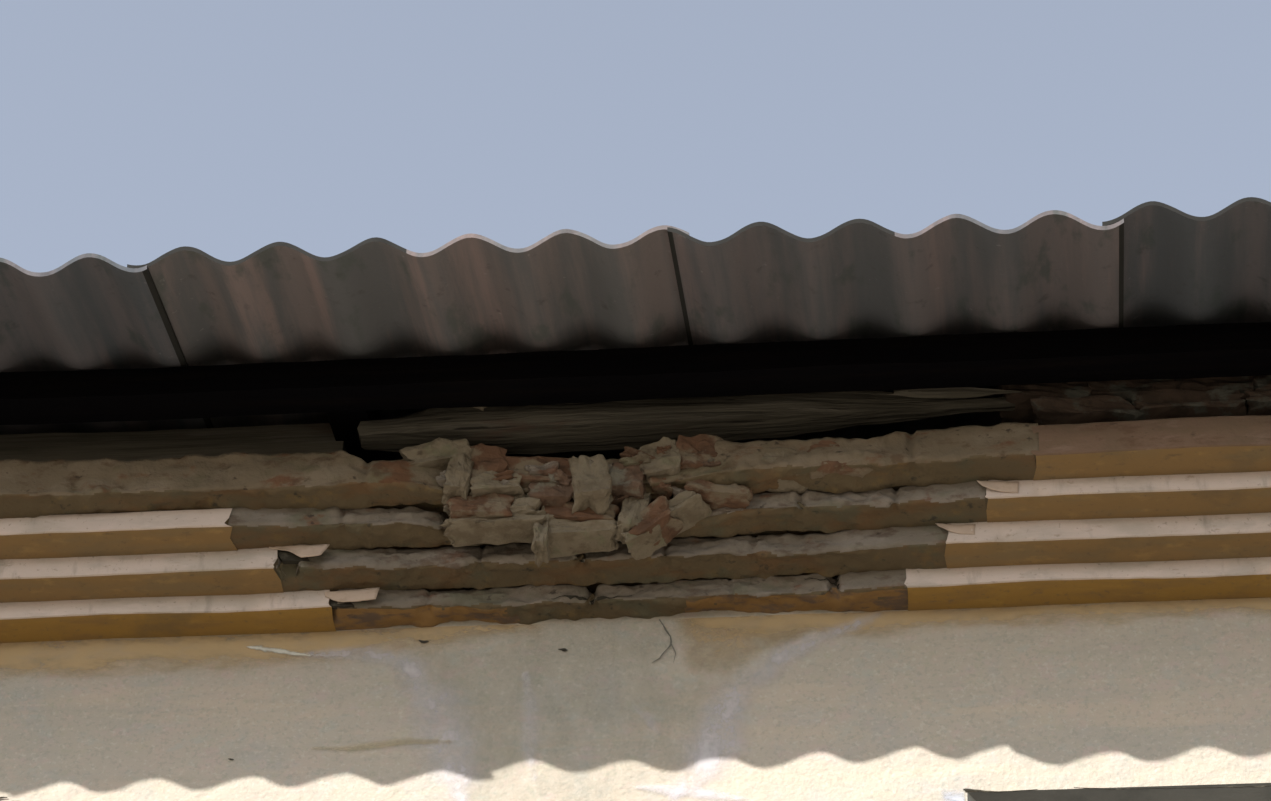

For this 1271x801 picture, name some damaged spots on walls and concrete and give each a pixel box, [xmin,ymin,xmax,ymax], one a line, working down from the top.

spalling [0,375,1271,643]
crack [554,593,632,605]
crack [652,619,676,663]